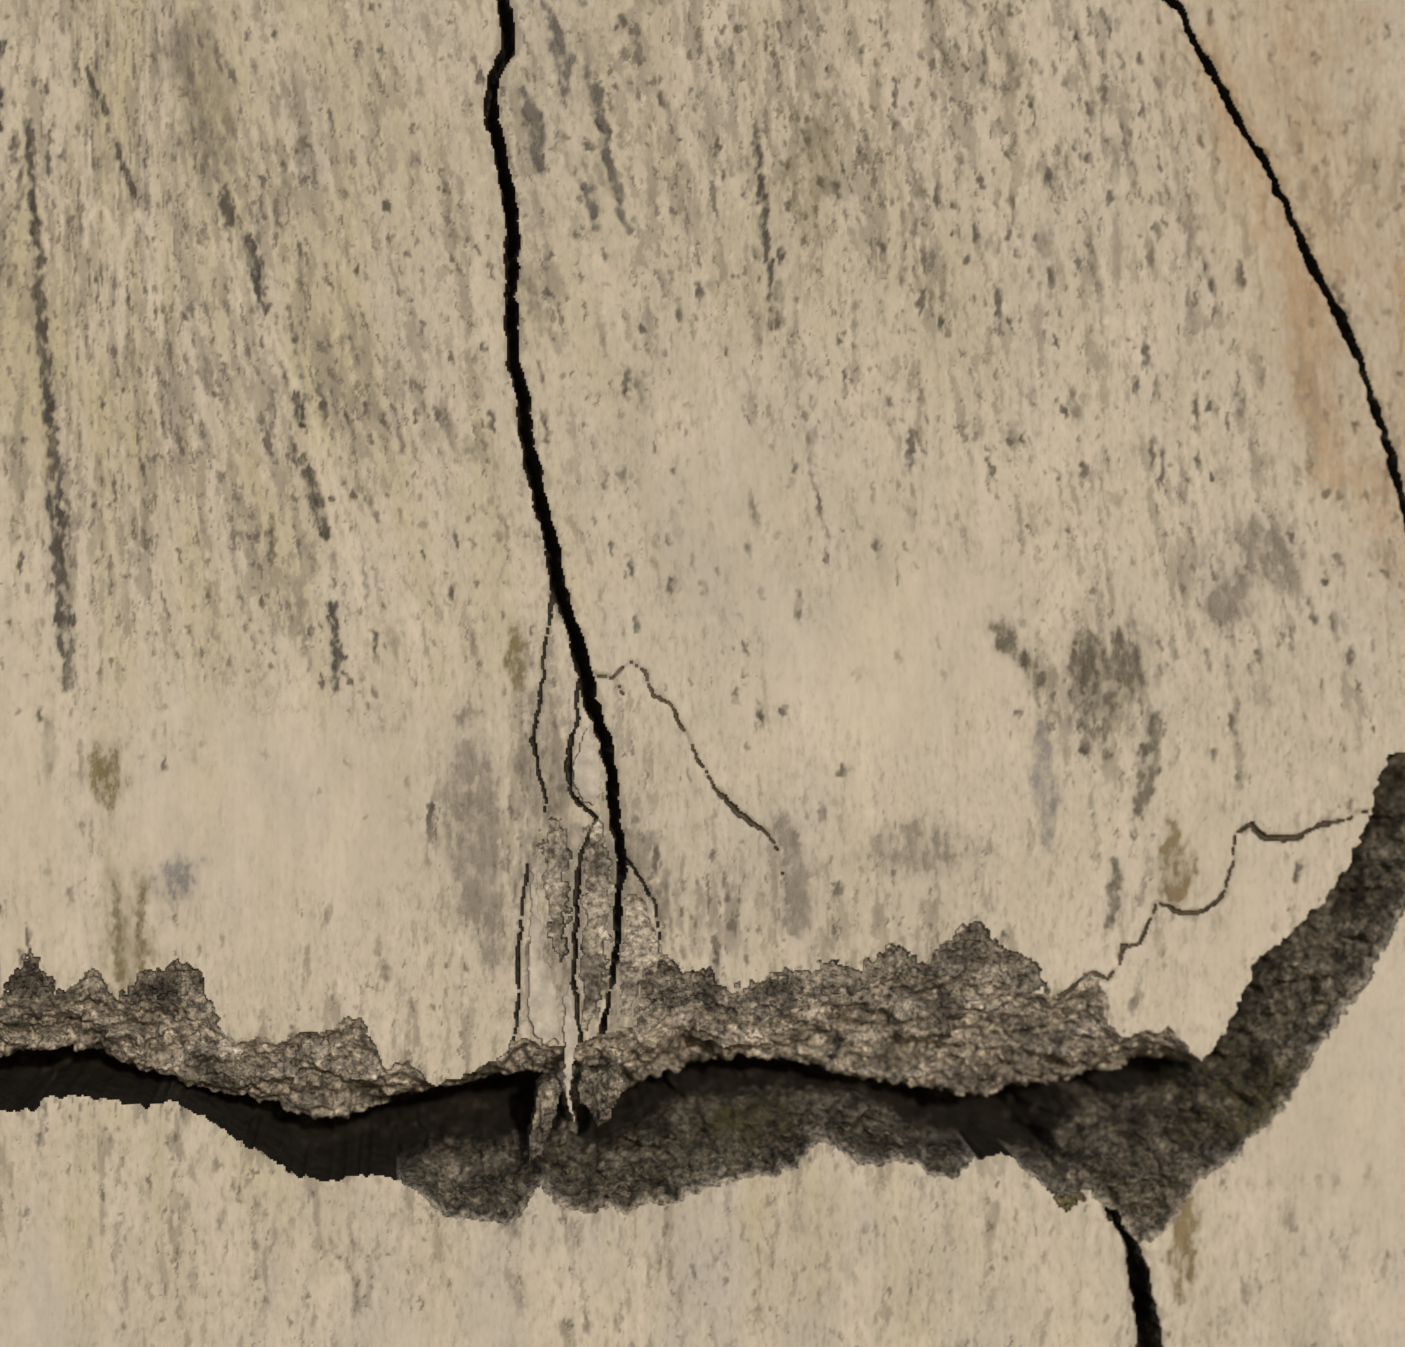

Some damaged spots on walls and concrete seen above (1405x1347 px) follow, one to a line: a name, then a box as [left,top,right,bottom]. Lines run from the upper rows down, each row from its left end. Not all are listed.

crack [484,0,661,1034]
crack [630,660,686,732]
crack [1162,0,1405,533]
crack [0,744,1405,1347]